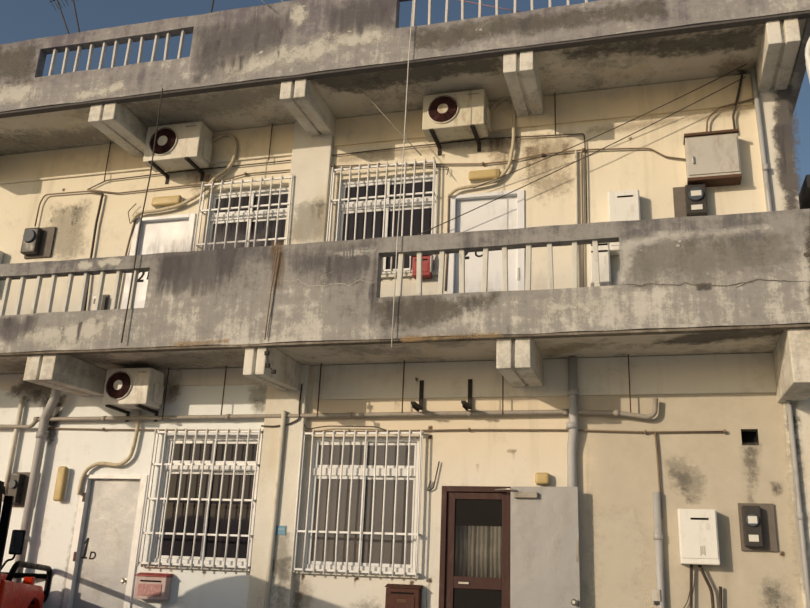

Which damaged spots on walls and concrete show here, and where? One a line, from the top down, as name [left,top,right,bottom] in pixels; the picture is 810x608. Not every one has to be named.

water stain [0,46,35,83]
crack [602,279,807,288]
water stain [11,381,66,444]